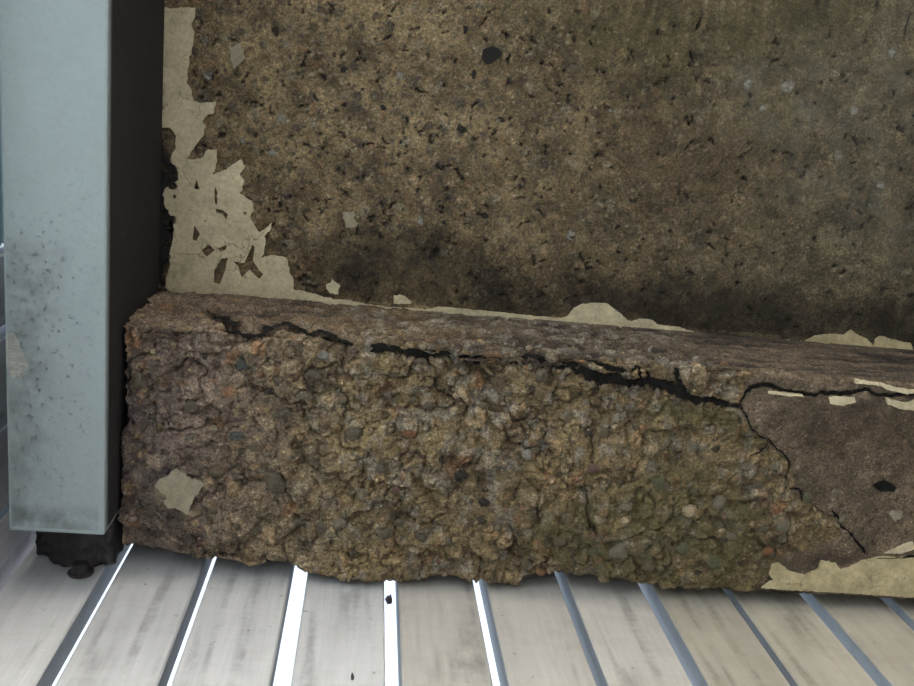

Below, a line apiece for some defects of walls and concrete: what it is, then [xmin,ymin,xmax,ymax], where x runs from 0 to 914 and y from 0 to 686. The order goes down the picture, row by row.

spalling [117,7,914,598]
crack [205,308,914,500]
crack [832,510,914,559]